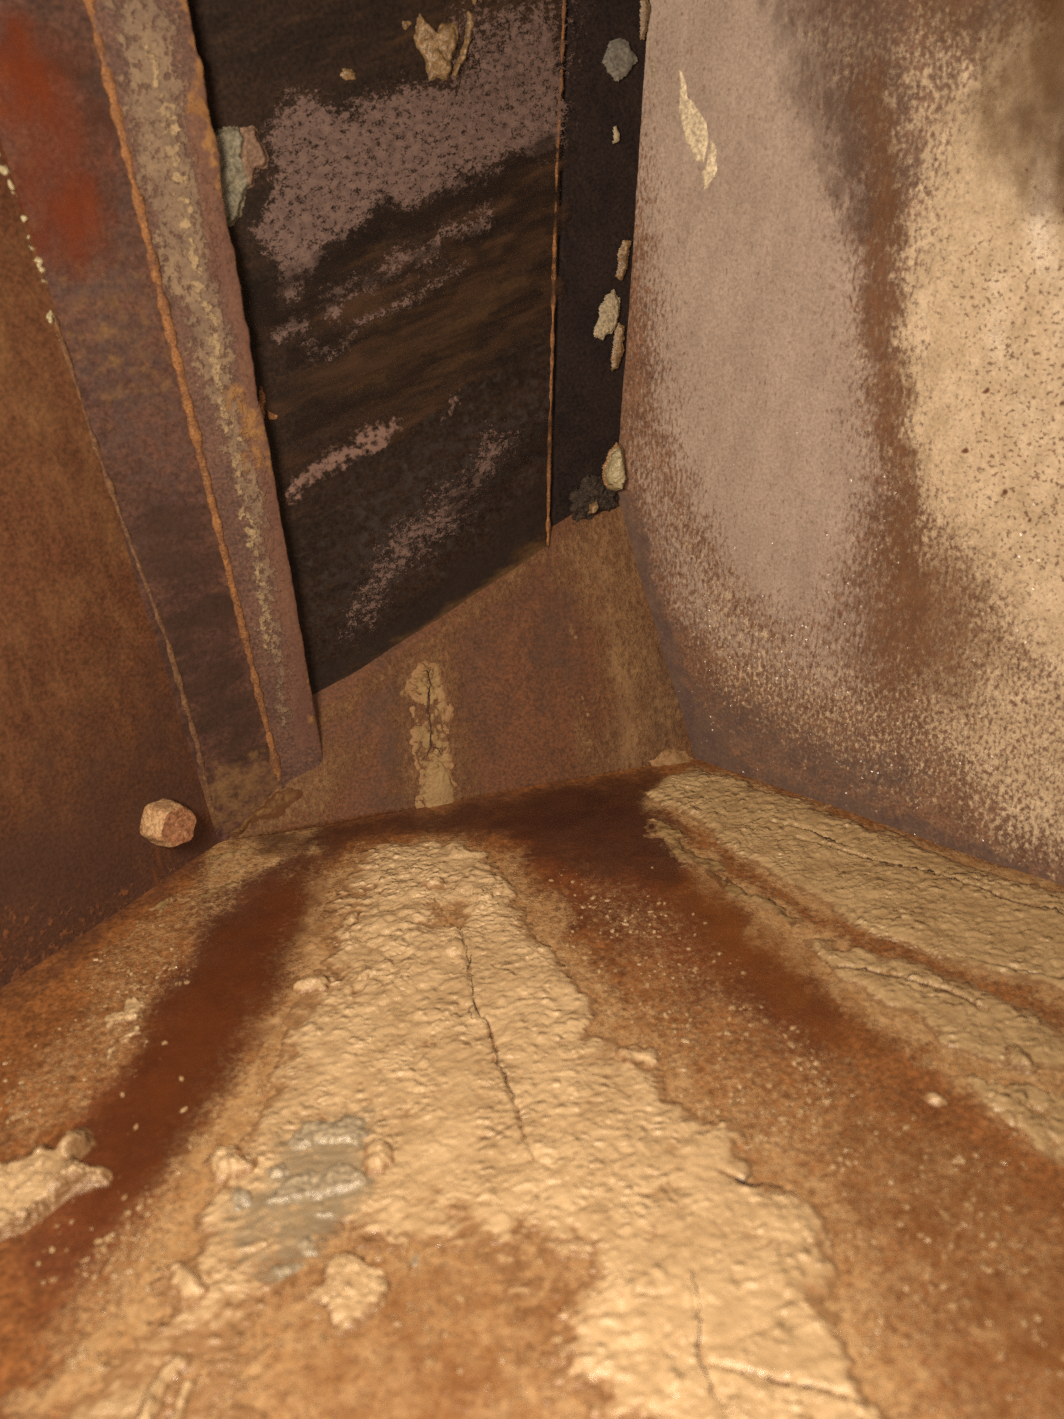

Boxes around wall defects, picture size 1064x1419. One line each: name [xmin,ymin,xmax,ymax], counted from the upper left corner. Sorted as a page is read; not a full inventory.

corrosion [258,385,278,420]
corrosion [853,61,992,706]
crack [793,826,1064,914]
crack [835,967,986,1010]
crack [969,957,1064,979]
corrosion [98,887,311,1196]
crack [460,926,534,1160]